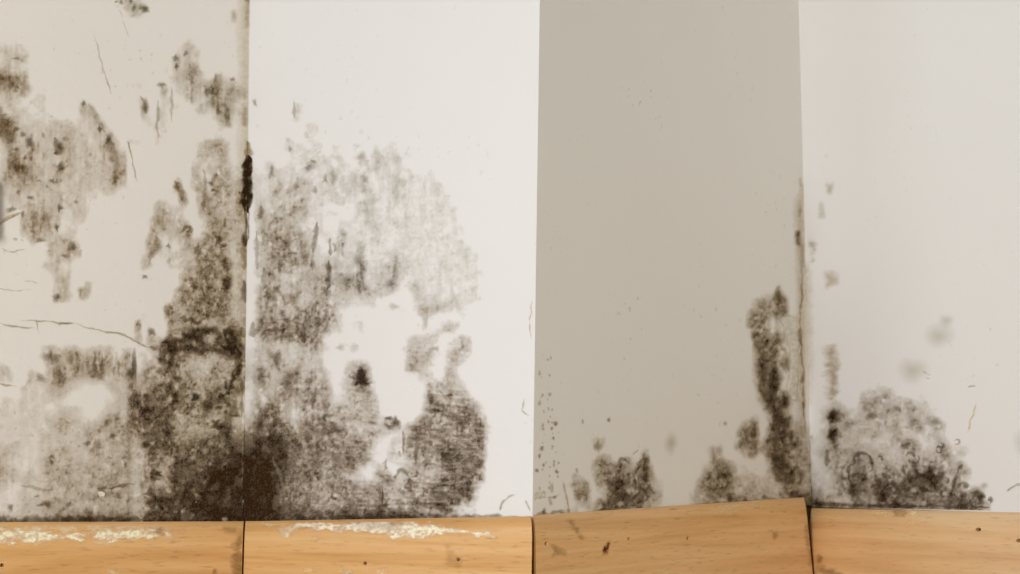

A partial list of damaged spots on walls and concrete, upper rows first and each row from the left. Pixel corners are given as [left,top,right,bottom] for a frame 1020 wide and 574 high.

water stain [211,85,230,120]
water stain [0,114,34,193]
water stain [239,144,253,224]
water stain [40,186,484,523]
water stain [741,292,984,510]
water stain [599,458,654,510]
water stain [701,464,746,502]